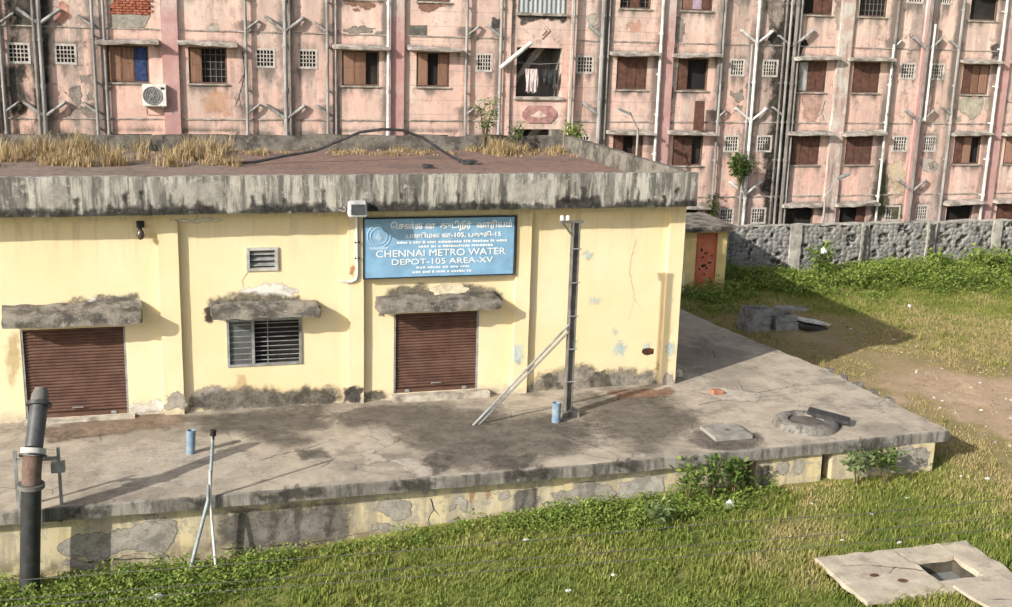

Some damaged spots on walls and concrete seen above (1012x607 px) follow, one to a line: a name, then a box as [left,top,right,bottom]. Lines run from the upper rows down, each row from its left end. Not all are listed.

flaking render [109,0,153,28]
leakage [4,0,50,123]
leakage [759,0,822,225]
flaking render [944,96,991,123]
leakage [0,192,79,217]
leakage [106,181,223,216]
leakage [249,189,325,213]
leakage [372,192,429,211]
flaking render [129,385,269,414]
leakage [45,386,386,442]
leakage [298,449,328,460]
flaking render [57,513,177,572]